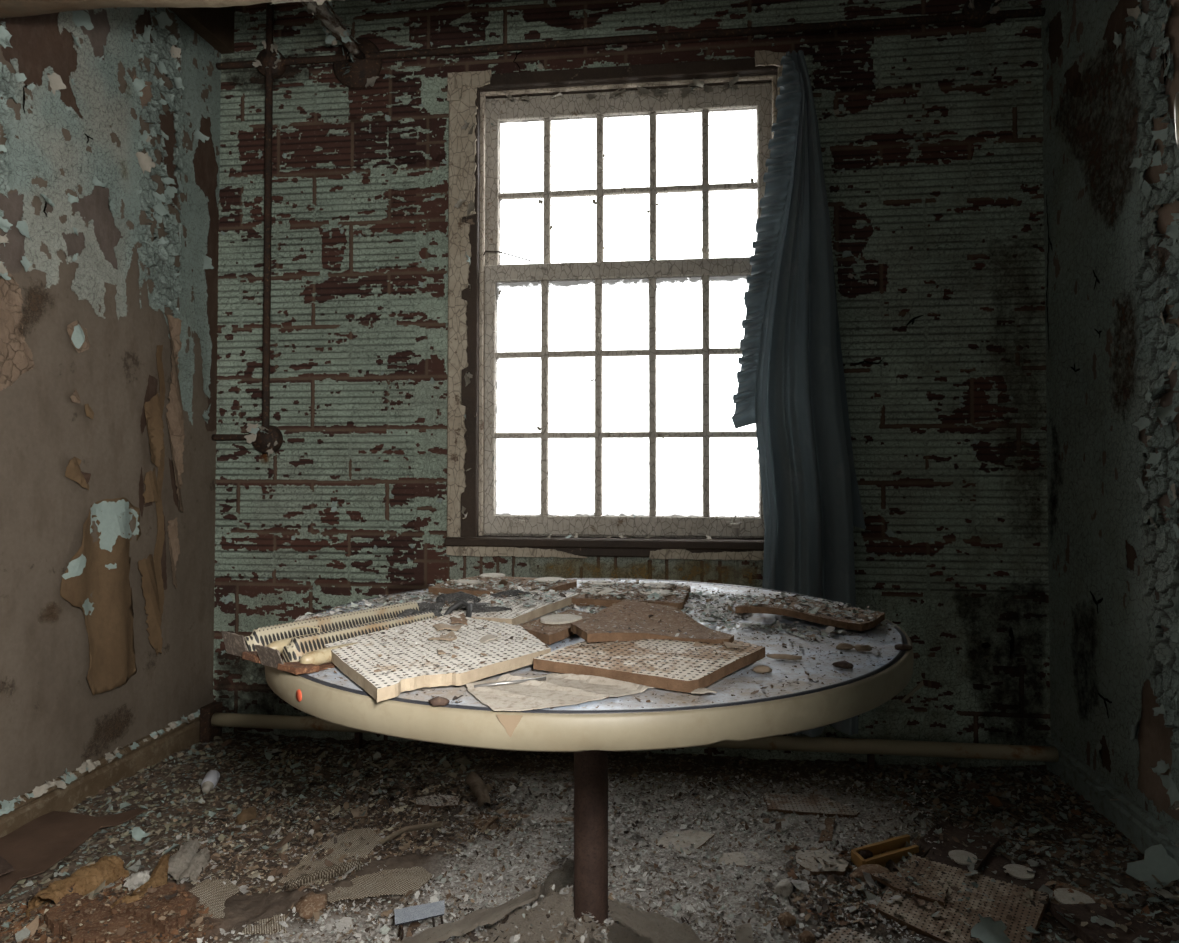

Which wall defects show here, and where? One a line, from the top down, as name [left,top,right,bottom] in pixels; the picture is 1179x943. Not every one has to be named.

peeling [0,9,111,119]
damp [1054,37,1140,232]
peeling [1143,0,1179,184]
crack [1161,0,1169,84]
peeling [40,176,123,270]
flaking render [159,2,1023,432]
flaking render [938,375,1043,472]
flaking render [389,476,447,507]
flaking render [217,530,897,654]
peeling [0,710,200,816]
peeling [1130,679,1179,821]
peeling [0,731,574,943]